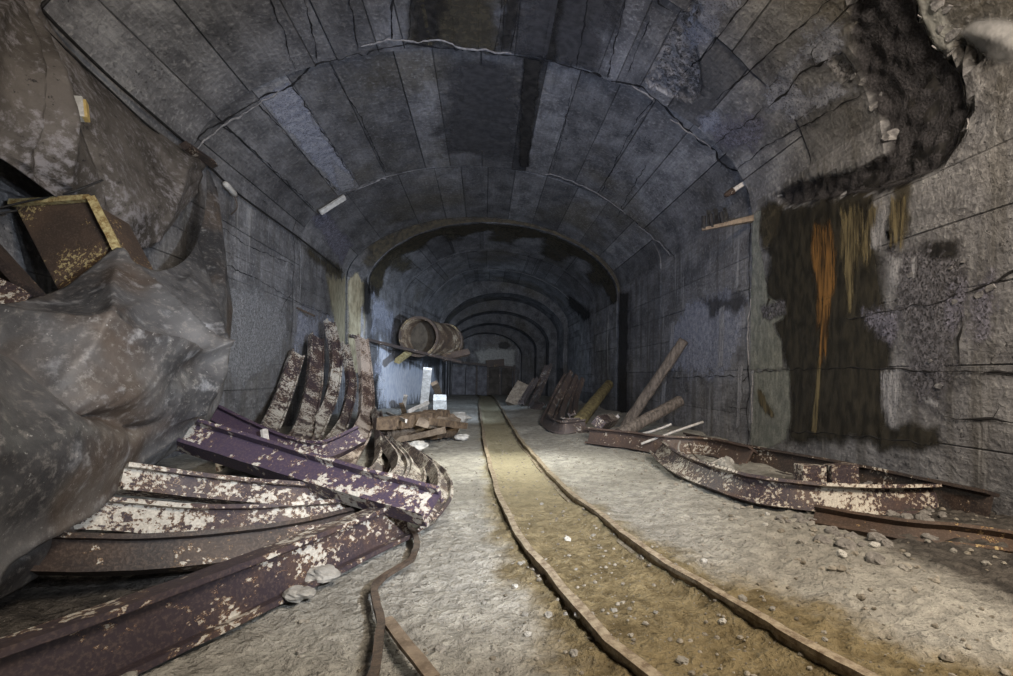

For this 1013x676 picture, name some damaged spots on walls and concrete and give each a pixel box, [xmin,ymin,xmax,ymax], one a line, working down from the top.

damp [410,0,622,167]
crack [195,0,882,339]
crack [673,223,1013,445]
corrosion [811,204,877,433]
damp [760,185,940,451]
spalling [777,0,993,205]
corrosion [889,196,906,249]